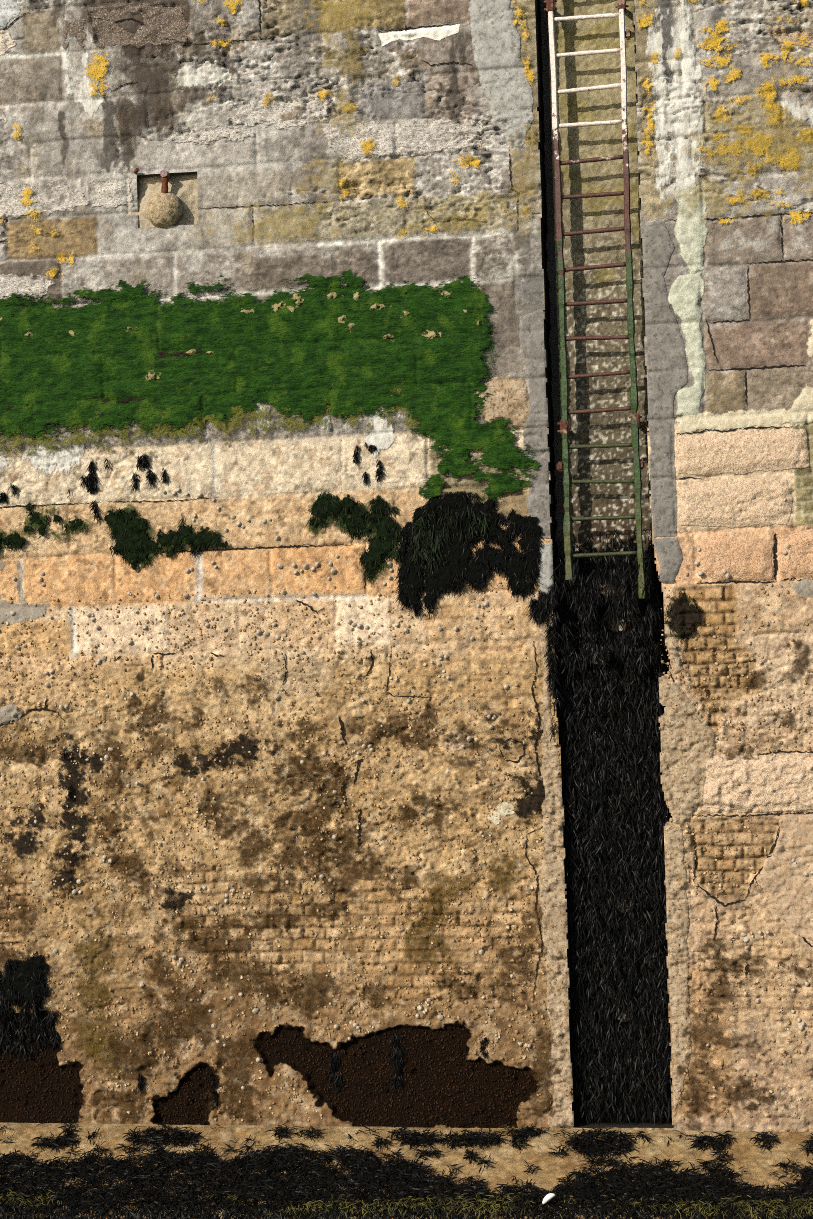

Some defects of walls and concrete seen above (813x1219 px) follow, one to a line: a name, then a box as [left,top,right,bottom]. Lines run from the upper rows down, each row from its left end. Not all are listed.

leakage [30,0,64,27]
leakage [58,111,69,161]
leakage [60,0,240,172]
crack [757,748,813,756]
peeling [249,623,574,1128]
crack [687,792,813,938]
peeling [0,1007,83,1124]
peeling [150,1061,219,1125]